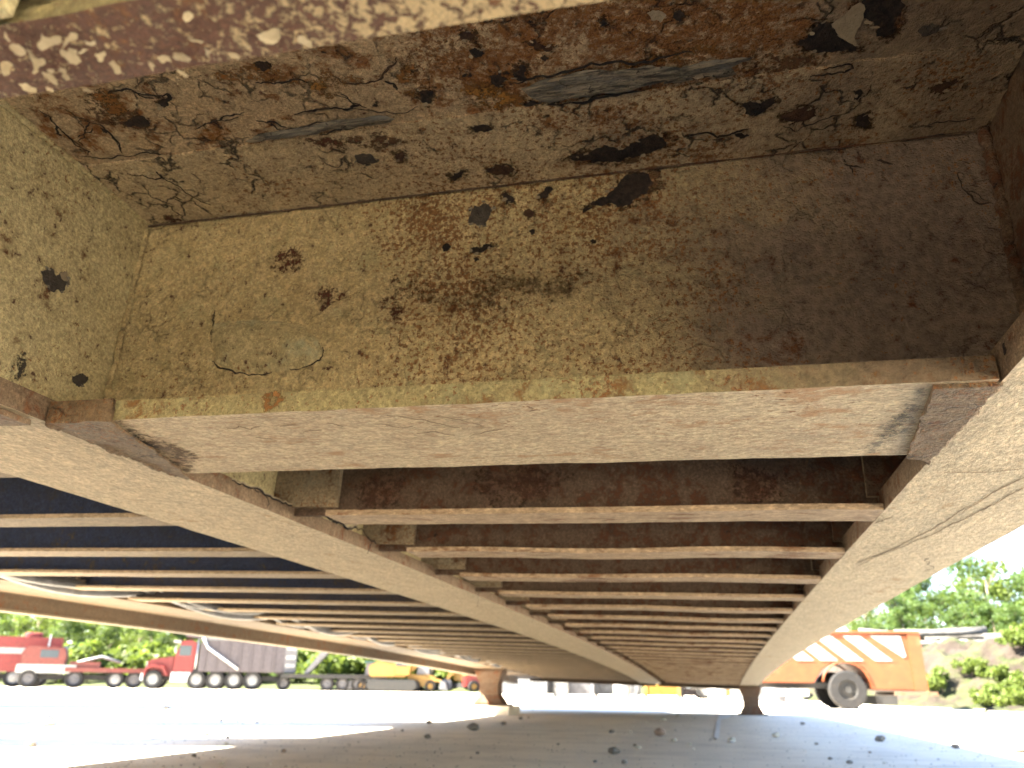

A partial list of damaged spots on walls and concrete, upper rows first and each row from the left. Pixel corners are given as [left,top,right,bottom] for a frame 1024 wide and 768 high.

peeling [0,32,122,96]
peeling [228,28,281,60]
spalling [791,0,908,58]
corrosion [83,87,150,133]
crack [108,88,172,105]
crack [193,58,418,152]
corrosion [455,79,527,111]
crack [685,129,749,139]
crack [39,110,211,205]
spalling [556,131,679,213]
corrosion [270,245,305,274]
corrosion [262,390,283,412]